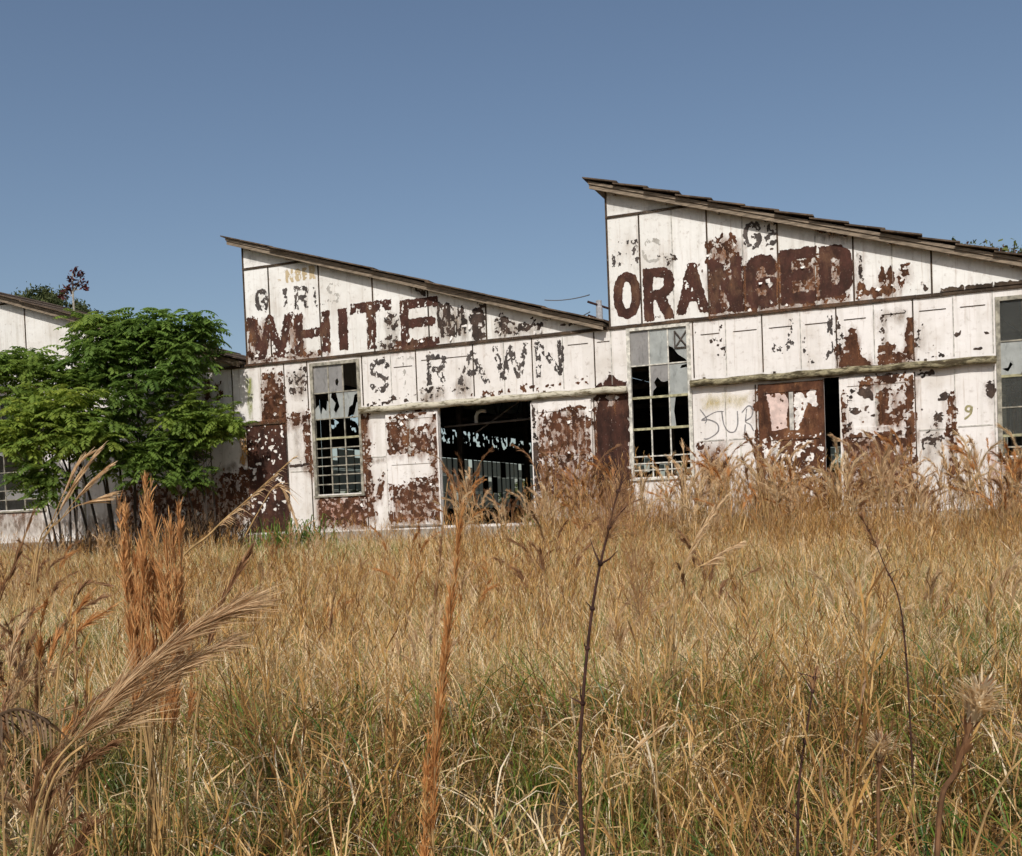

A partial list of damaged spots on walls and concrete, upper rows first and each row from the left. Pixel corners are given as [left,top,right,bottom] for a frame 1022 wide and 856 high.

peeling [236,346,330,521]
peeling [361,368,561,525]
peeling [531,404,597,510]
rust [538,372,635,507]
peeling [762,390,824,502]
peeling [841,384,875,434]
peeling [921,391,950,454]